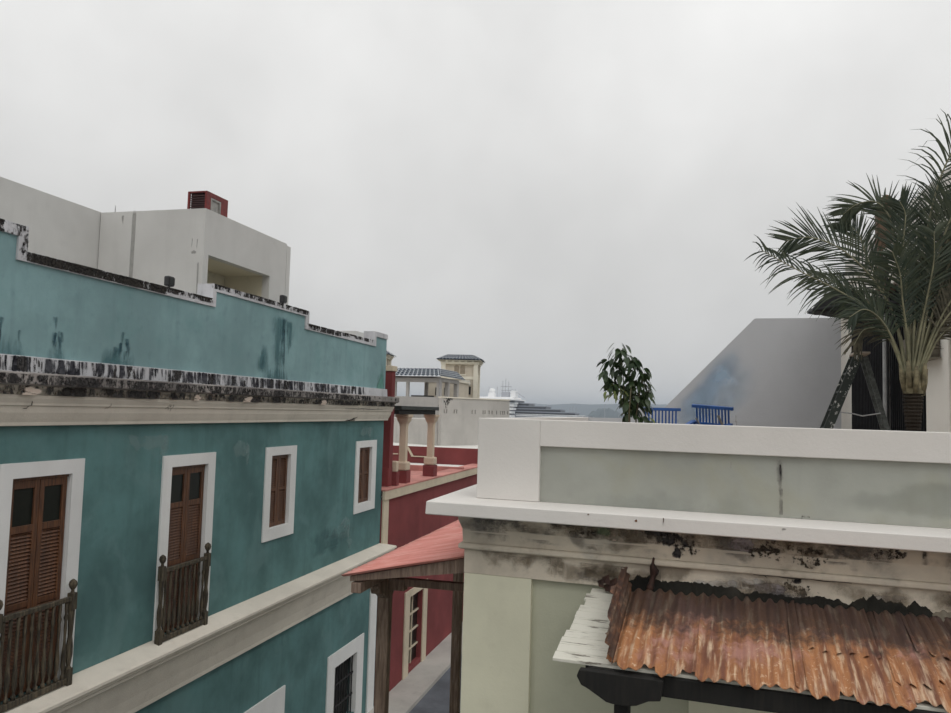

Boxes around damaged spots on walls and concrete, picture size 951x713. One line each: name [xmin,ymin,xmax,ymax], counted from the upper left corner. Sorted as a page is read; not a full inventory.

flaking render [22,386,42,395]